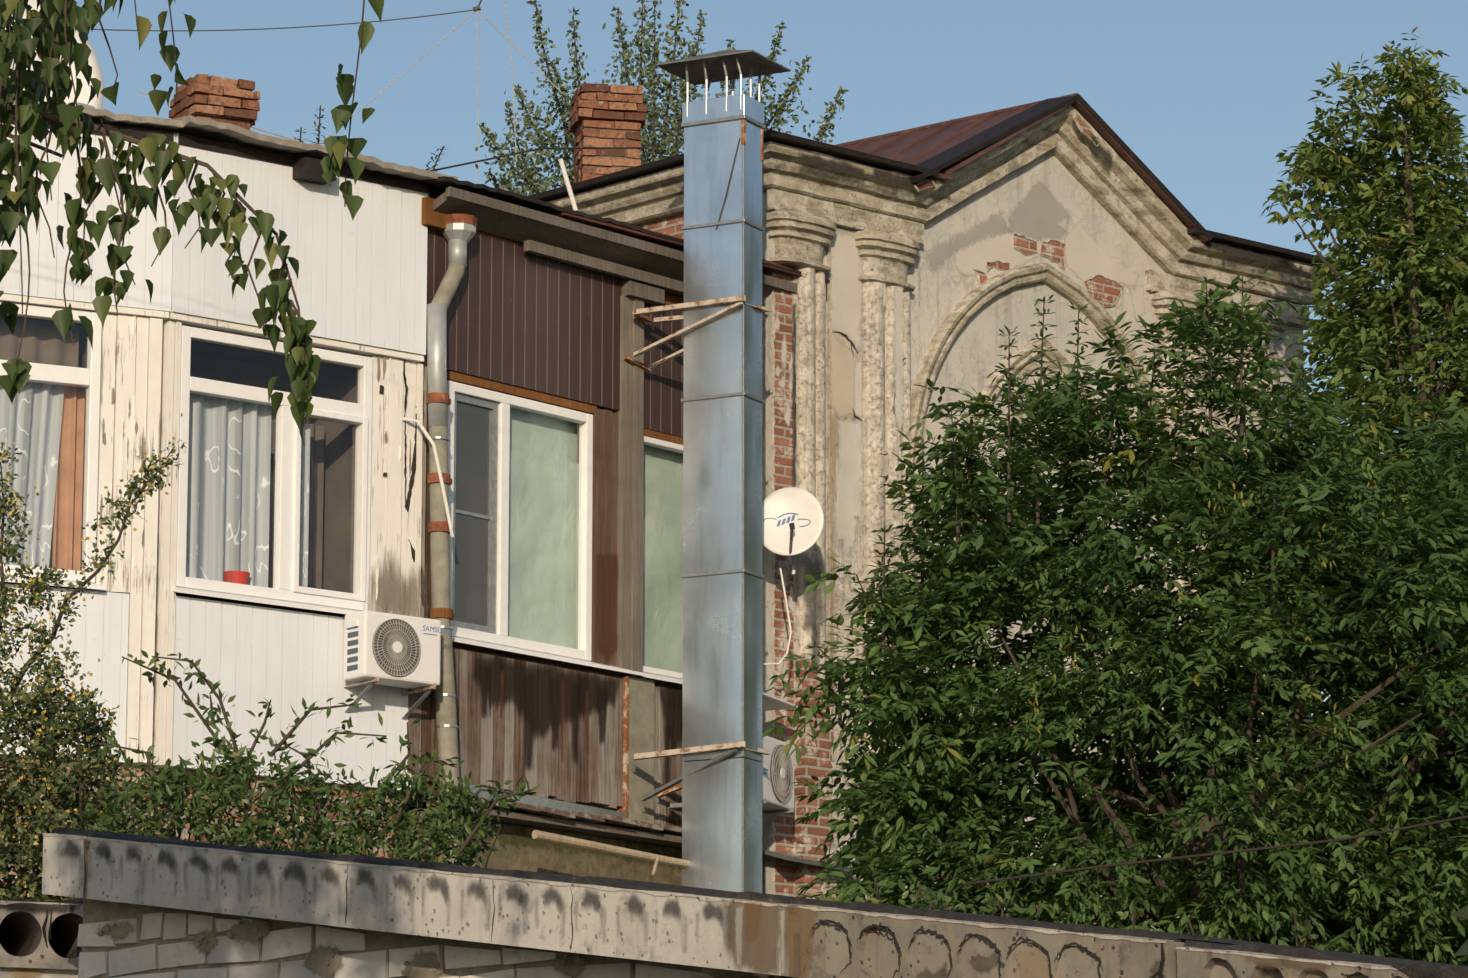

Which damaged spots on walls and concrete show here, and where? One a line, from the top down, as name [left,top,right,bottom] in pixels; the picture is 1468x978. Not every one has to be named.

peeling [953,219,1145,320]
peeling [377,355,391,382]
flaking render [771,272,797,492]
leakage [474,653,619,769]
leakage [660,685,683,785]
flaking render [771,552,834,899]
leakage [158,851,237,872]
leakage [257,860,336,885]
leakage [429,877,448,900]
leakage [583,891,600,910]
leakage [664,901,680,917]
leakage [704,900,780,974]